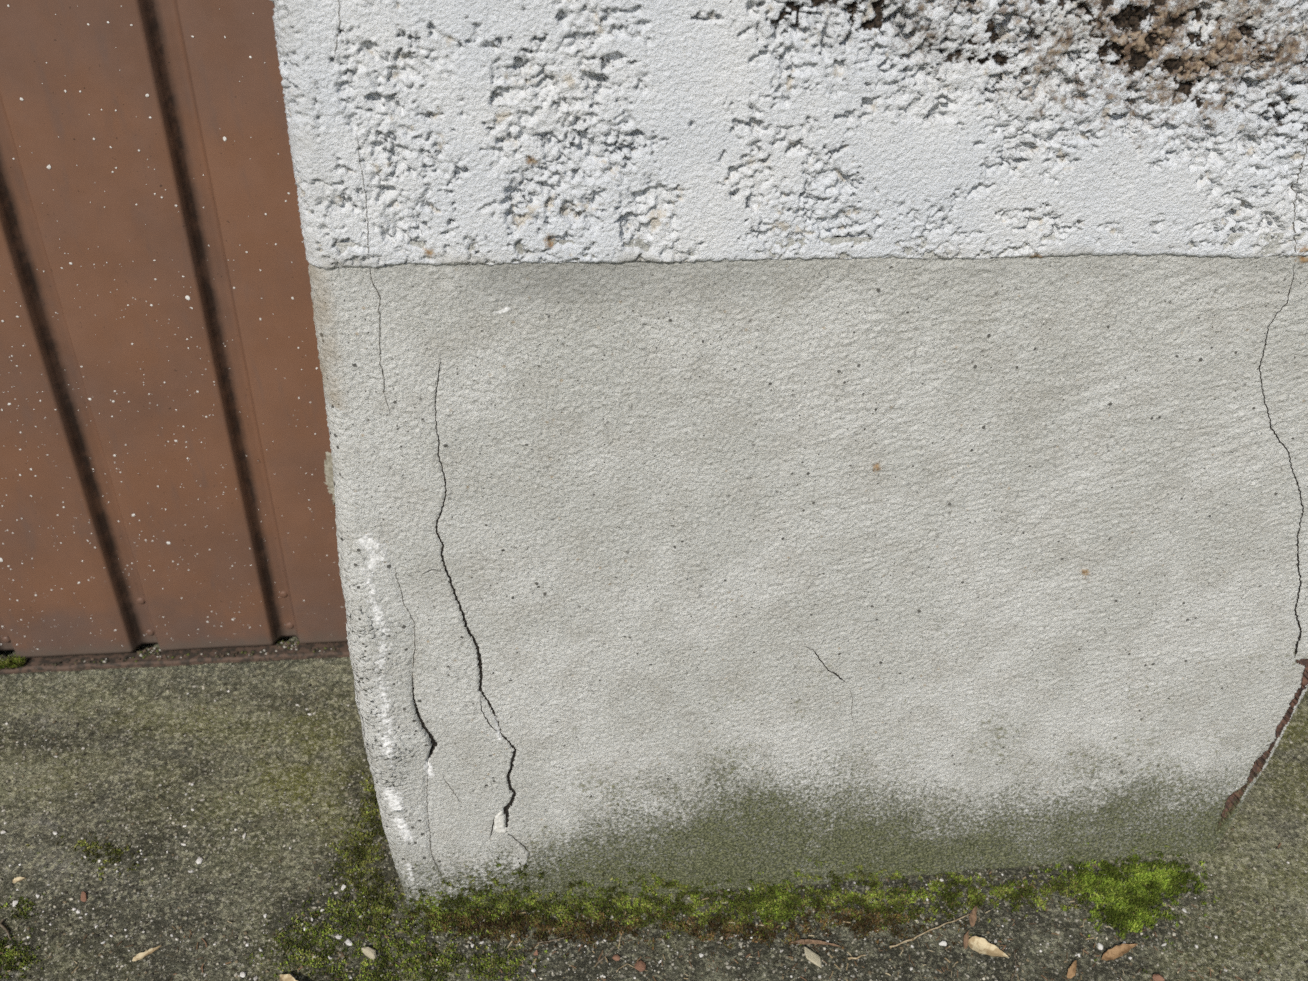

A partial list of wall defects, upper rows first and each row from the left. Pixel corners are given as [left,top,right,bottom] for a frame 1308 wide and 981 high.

leakage [766,0,891,42]
leakage [908,19,1009,66]
leakage [1028,0,1279,108]
leakage [1241,60,1308,131]
crack [1259,139,1308,658]
leakage [353,533,398,770]
crack [395,364,530,874]
leakage [423,757,435,779]
leakage [378,787,413,843]
leakage [393,847,565,915]